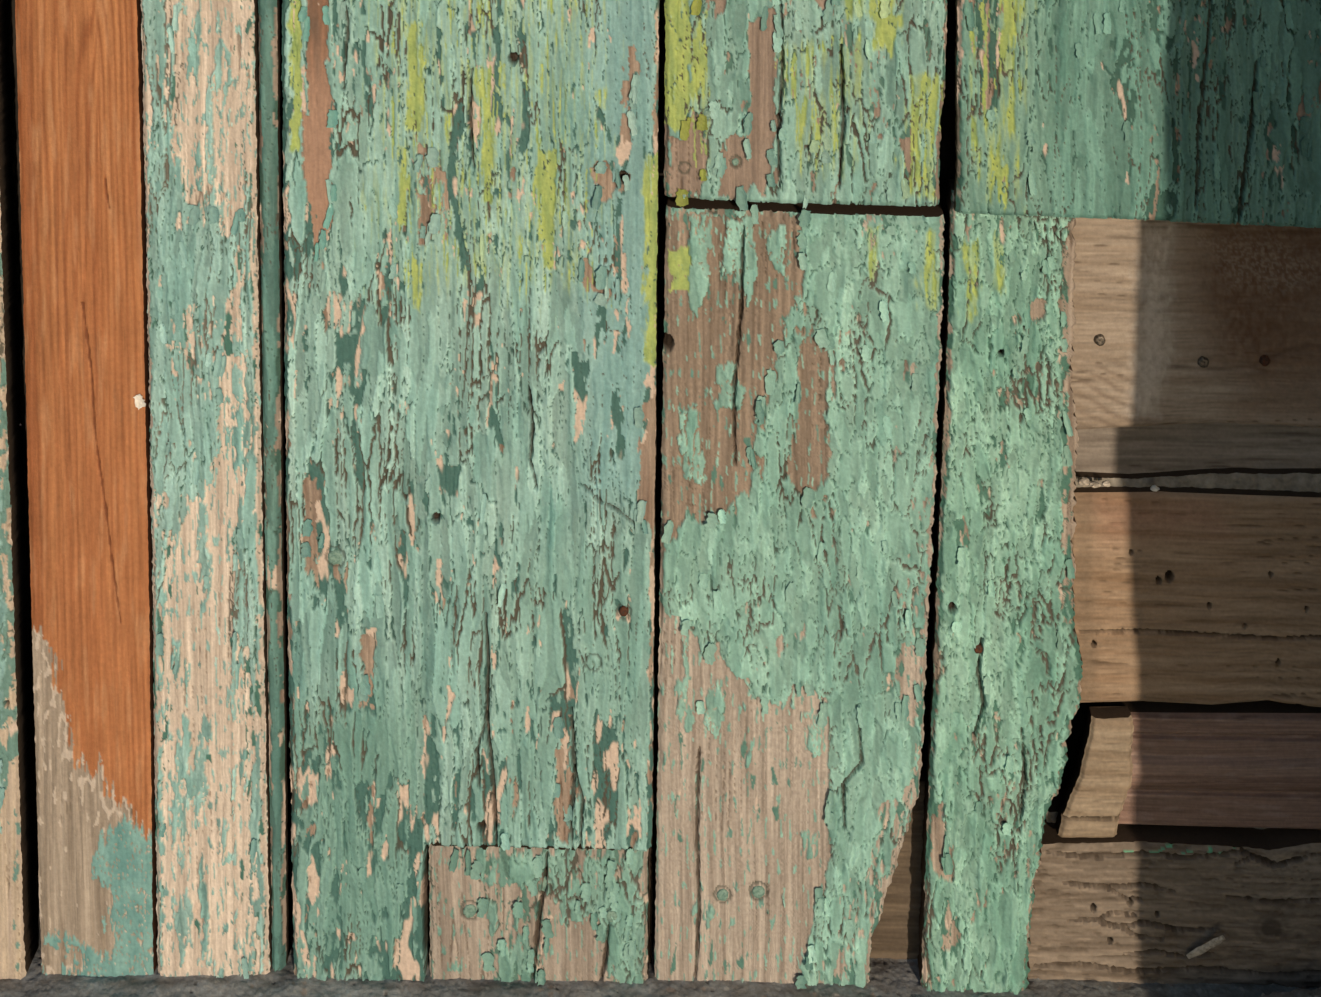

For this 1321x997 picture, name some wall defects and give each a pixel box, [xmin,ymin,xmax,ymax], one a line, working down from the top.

peeling [167,0,253,239]
peeling [298,0,346,262]
peeling [634,6,837,544]
crack [731,225,746,467]
peeling [0,349,259,980]
peeling [429,848,507,980]
peeling [512,848,637,986]
peeling [654,601,836,989]
peeling [891,591,926,722]
crack [971,637,986,740]
crack [1019,727,1029,827]
crack [1034,814,1321,977]